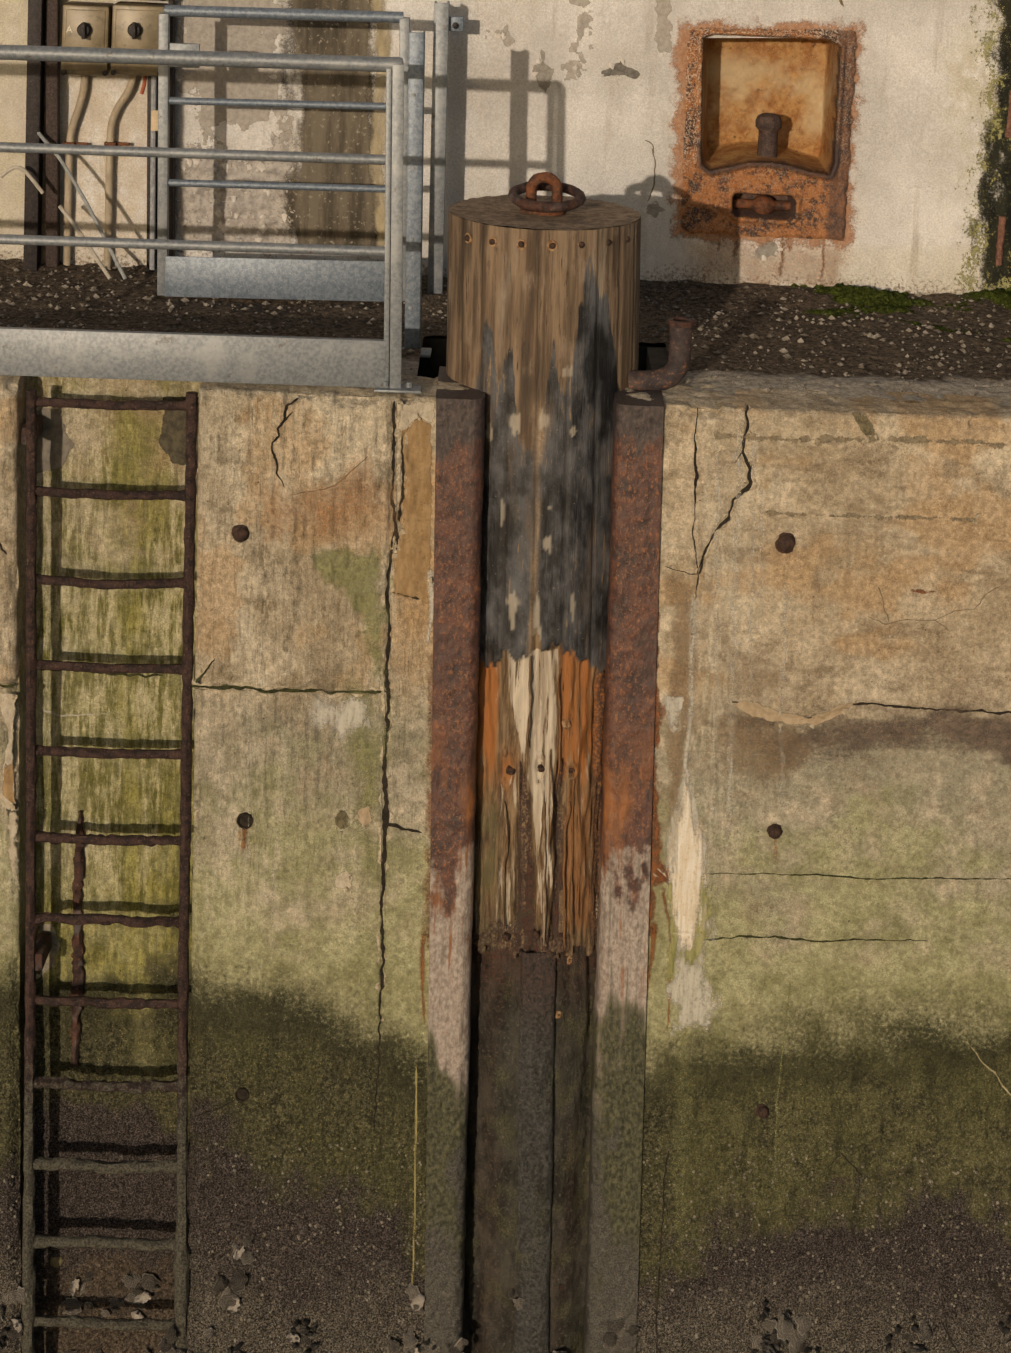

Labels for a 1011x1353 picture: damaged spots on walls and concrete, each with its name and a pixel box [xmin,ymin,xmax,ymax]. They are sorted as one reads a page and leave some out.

leakage [281,0,391,246]
peeling [484,25,515,47]
peeling [532,0,642,94]
peeling [654,0,673,53]
rust [669,19,866,275]
leakage [954,0,1011,291]
crack [666,405,757,643]
crack [0,398,424,1131]
rust [420,850,430,1023]
rust [646,685,671,1006]
leakage [667,579,718,1030]
crack [851,702,1011,715]